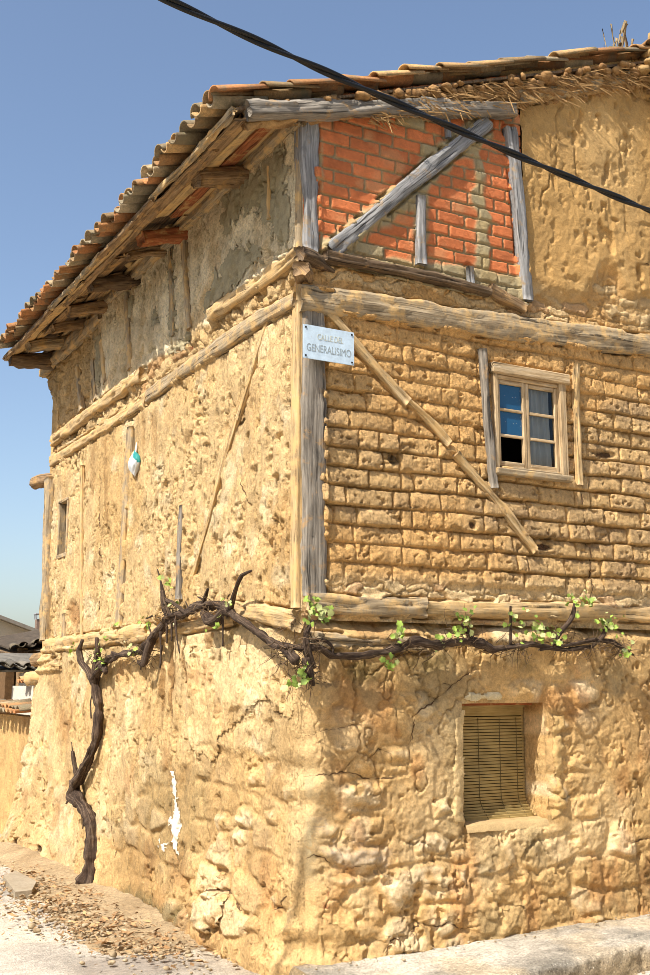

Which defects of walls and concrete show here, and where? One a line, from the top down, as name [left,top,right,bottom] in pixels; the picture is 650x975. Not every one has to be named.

crack [305,670,472,780]
peeling [157,771,182,855]
crack [204,876,242,911]
crack [386,922,463,952]